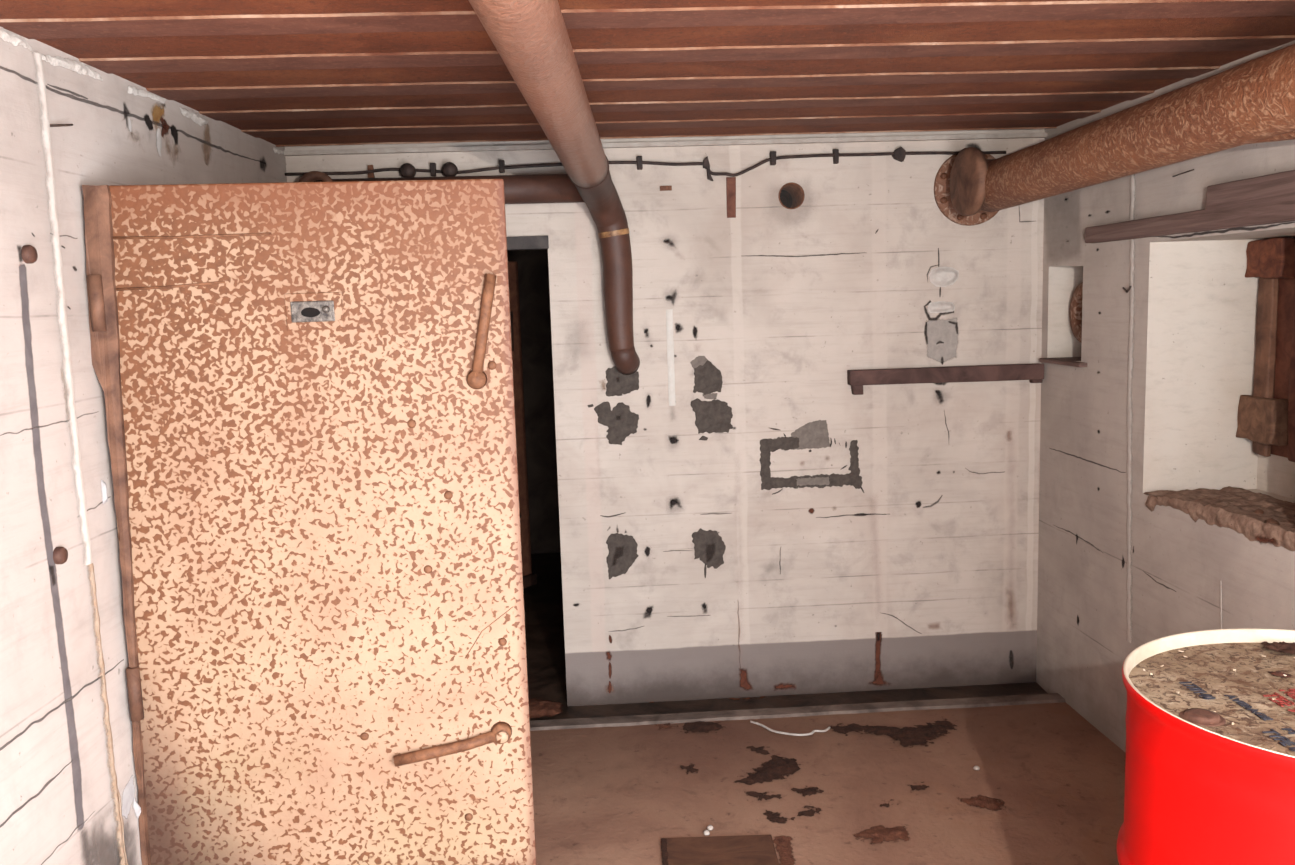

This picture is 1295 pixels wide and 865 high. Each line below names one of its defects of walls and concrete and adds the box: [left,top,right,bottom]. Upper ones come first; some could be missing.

spalling [587,366,651,445]
spalling [690,356,736,440]
spalling [606,527,650,579]
spalling [692,528,726,578]
rust [870,632,889,686]